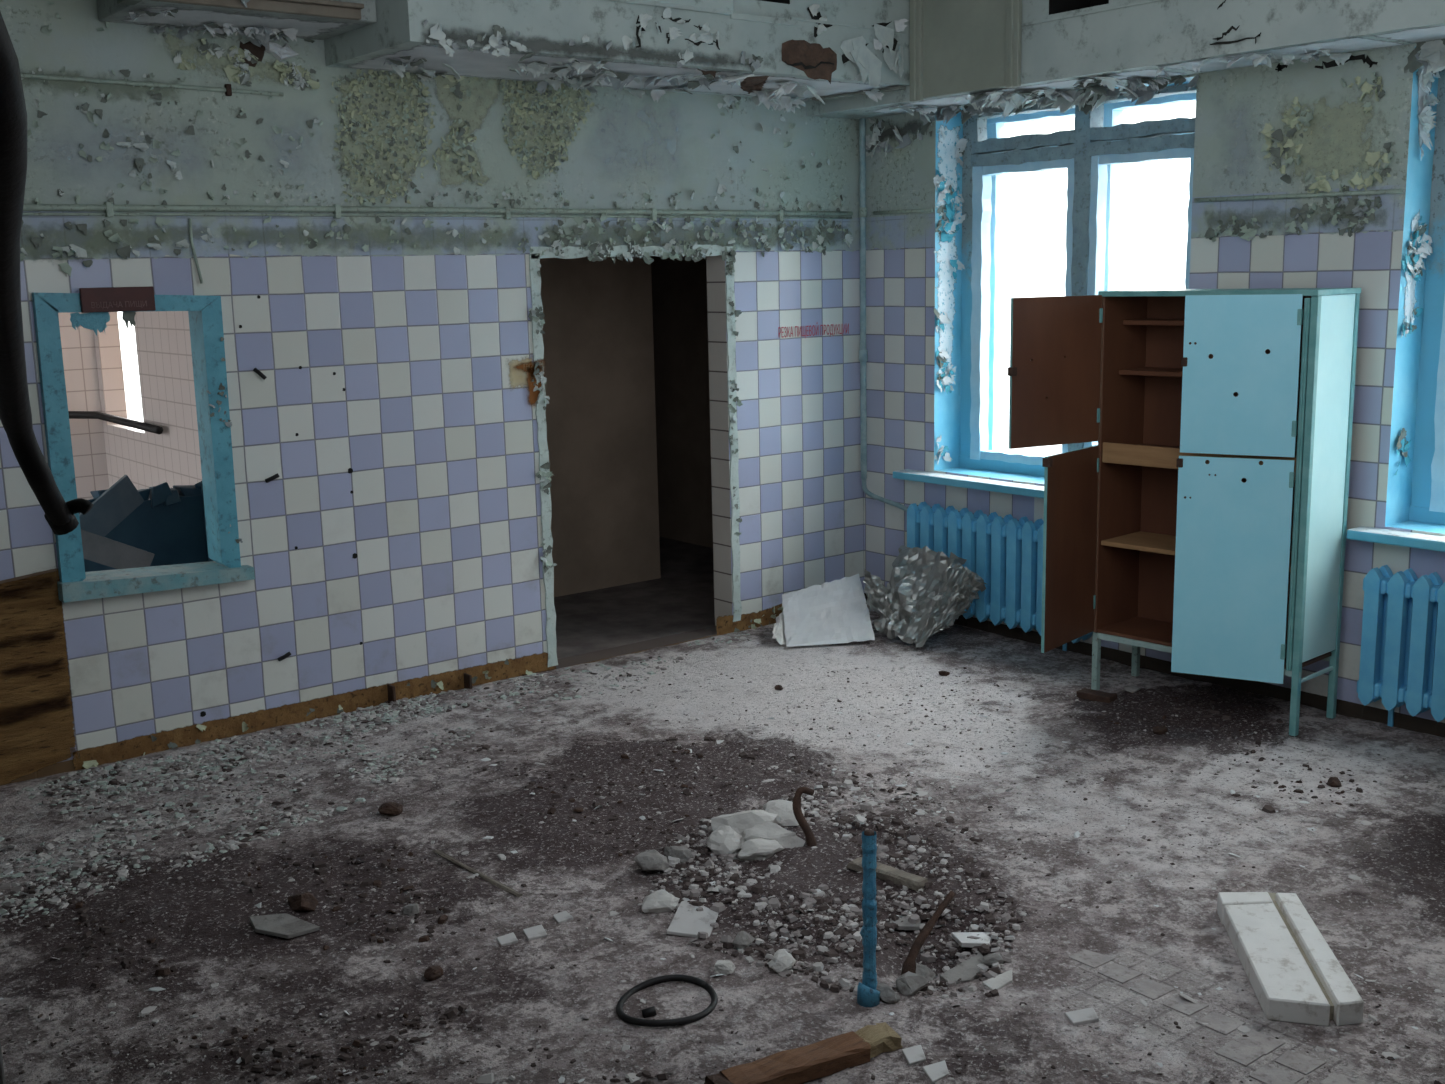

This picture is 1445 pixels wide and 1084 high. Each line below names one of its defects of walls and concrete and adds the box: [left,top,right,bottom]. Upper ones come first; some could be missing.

peeling [20,66,318,277]
peeling [532,362,550,410]
peeling [728,378,743,454]
peeling [0,568,554,786]